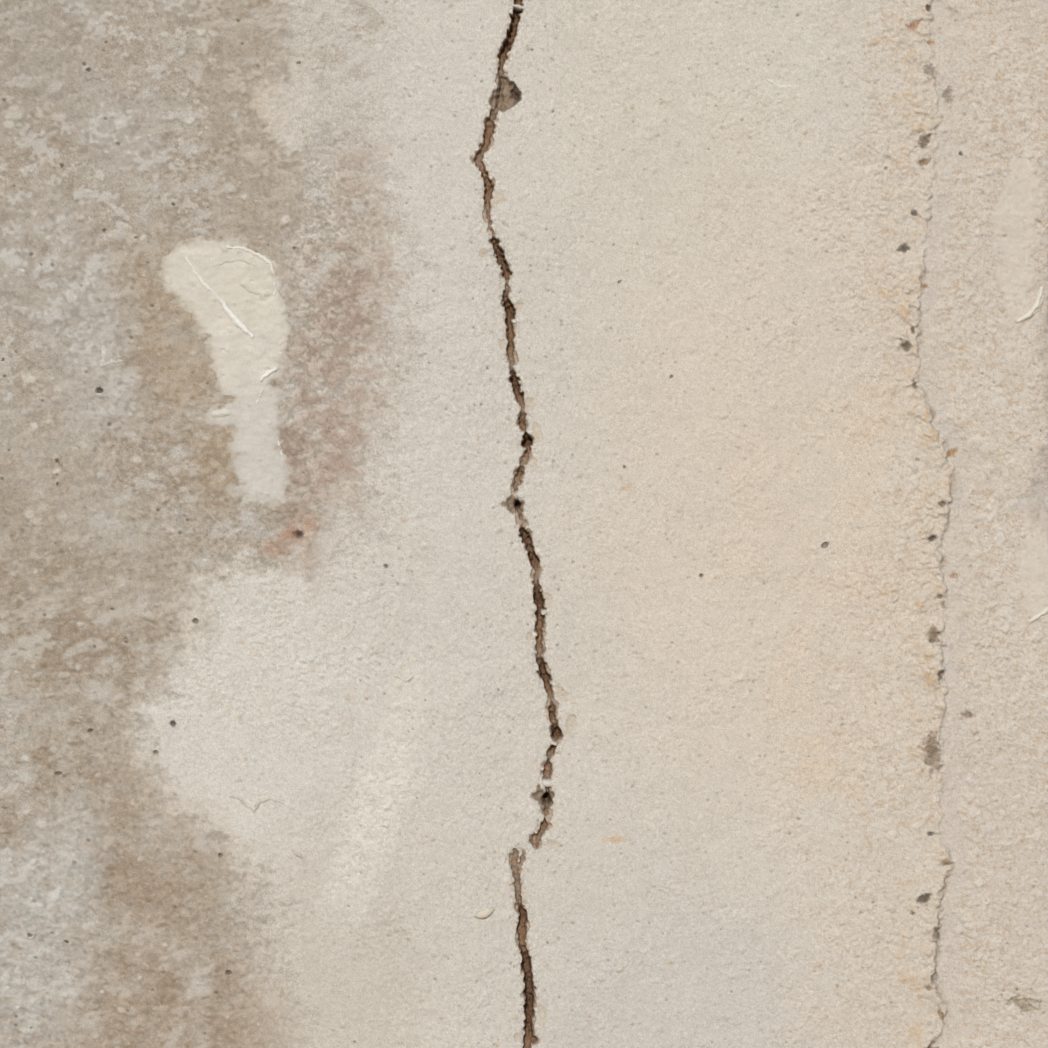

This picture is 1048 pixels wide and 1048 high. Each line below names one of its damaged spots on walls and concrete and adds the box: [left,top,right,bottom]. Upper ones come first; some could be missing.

water stain [0,0,413,1048]
crack [468,0,578,1048]